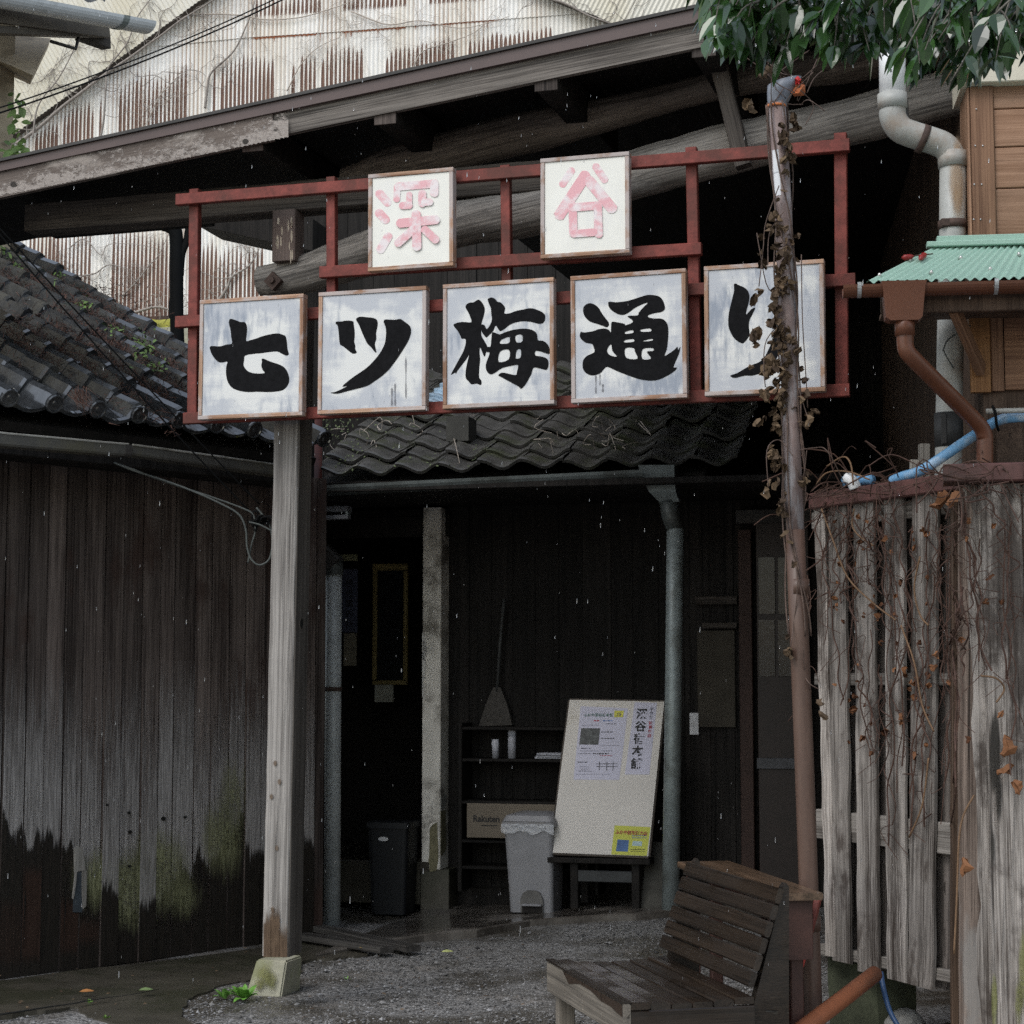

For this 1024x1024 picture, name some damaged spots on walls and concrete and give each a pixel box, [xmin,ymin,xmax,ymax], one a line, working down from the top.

corrosion [255,0,321,18]
corrosion [343,0,406,13]
corrosion [35,101,102,150]
corrosion [118,66,187,132]
corrosion [213,57,274,111]
corrosion [29,236,91,285]
corrosion [111,233,170,317]
corrosion [201,242,263,300]
water stain [0,688,287,980]
water stain [302,738,314,933]